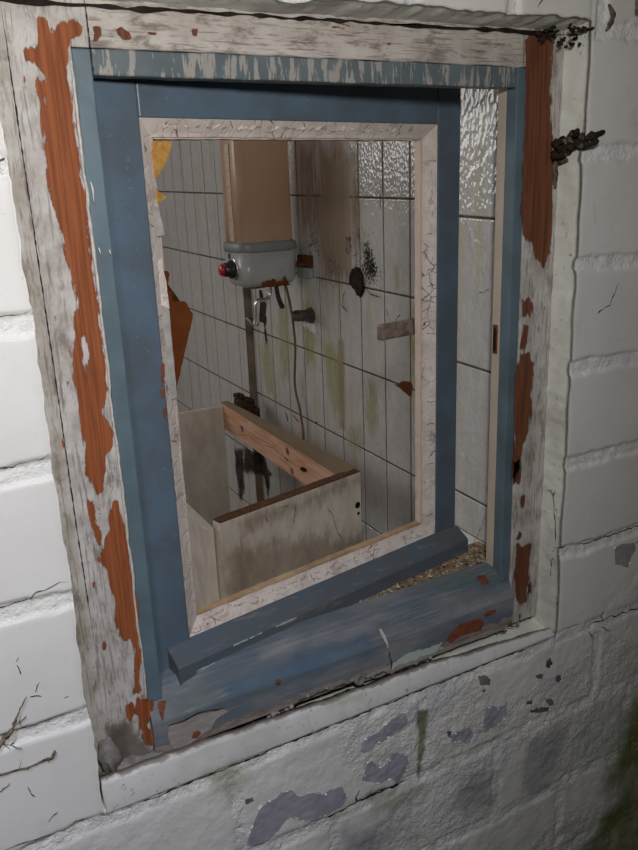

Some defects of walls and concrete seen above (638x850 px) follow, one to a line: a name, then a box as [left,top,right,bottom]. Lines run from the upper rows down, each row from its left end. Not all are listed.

peeling [520,29,554,269]
peeling [23,16,229,750]
peeling [511,297,534,485]
peeling [513,532,532,604]
peeling [389,610,496,674]
crack [588,608,638,638]
peeling [360,712,409,784]
peeling [447,702,508,745]
spalling [478,674,490,692]
spalling [526,698,554,714]
peeling [245,787,348,846]